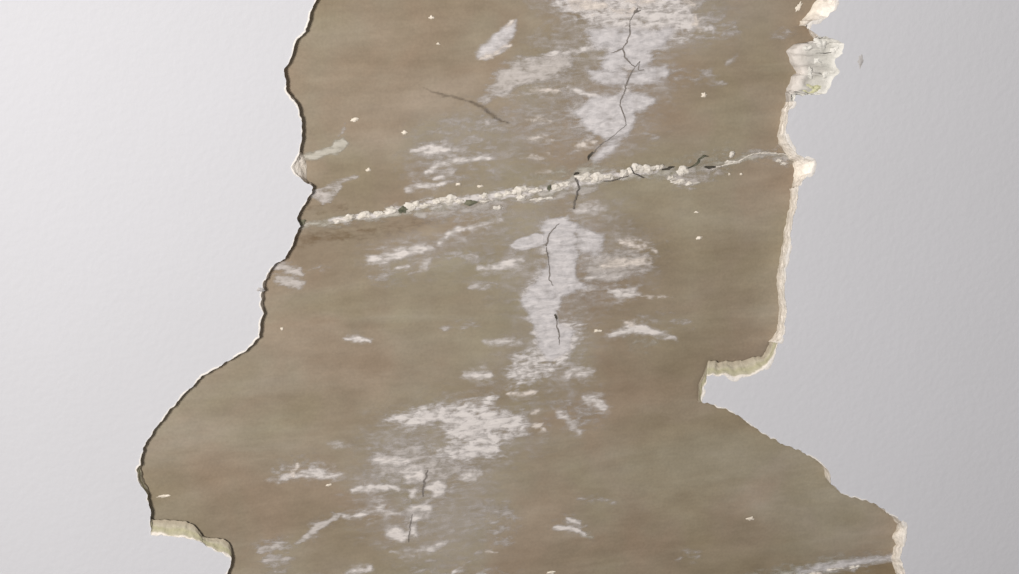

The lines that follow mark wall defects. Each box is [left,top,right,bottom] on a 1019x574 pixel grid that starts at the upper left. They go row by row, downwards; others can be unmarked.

damp [478,0,737,163]
efflorescence [405,133,508,192]
crack [298,8,790,283]
damp [271,262,304,276]
spalling [135,0,908,574]
efflorescence [608,316,676,339]
efflorescence [342,203,662,554]
efflorescence [280,463,342,480]
crack [408,470,428,542]
damp [257,542,291,573]
efflorescence [346,565,372,574]